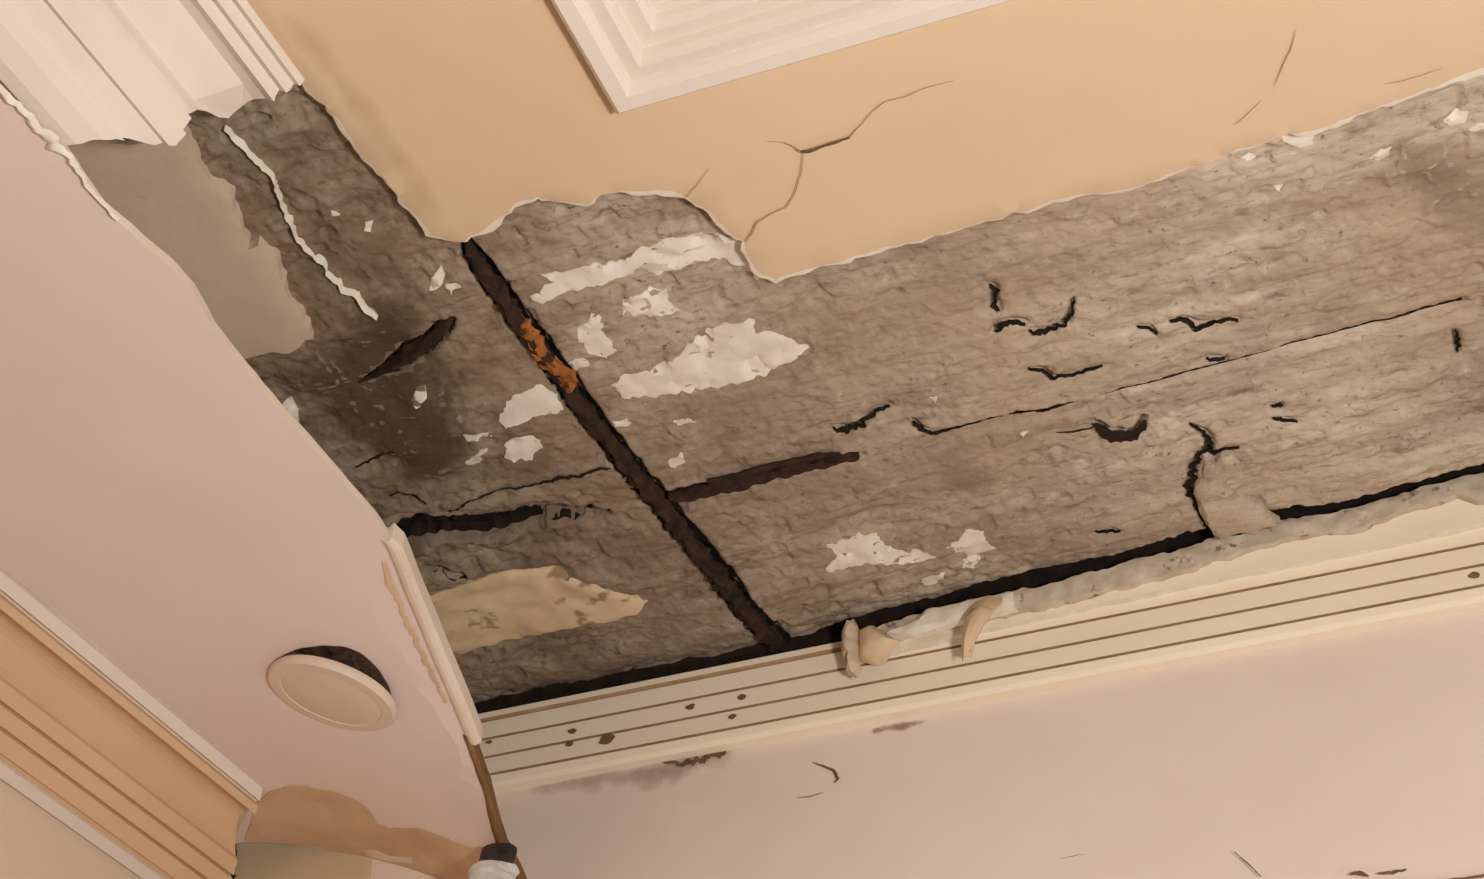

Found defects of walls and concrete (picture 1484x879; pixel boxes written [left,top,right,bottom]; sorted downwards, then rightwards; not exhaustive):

crack [745,81,952,242]
spalling [187,74,1484,703]
crack [833,283,1462,443]
crack [1095,527,1121,535]
crack [1182,422,1240,535]
crack [1350,869,1406,877]
crack [1452,871,1484,879]